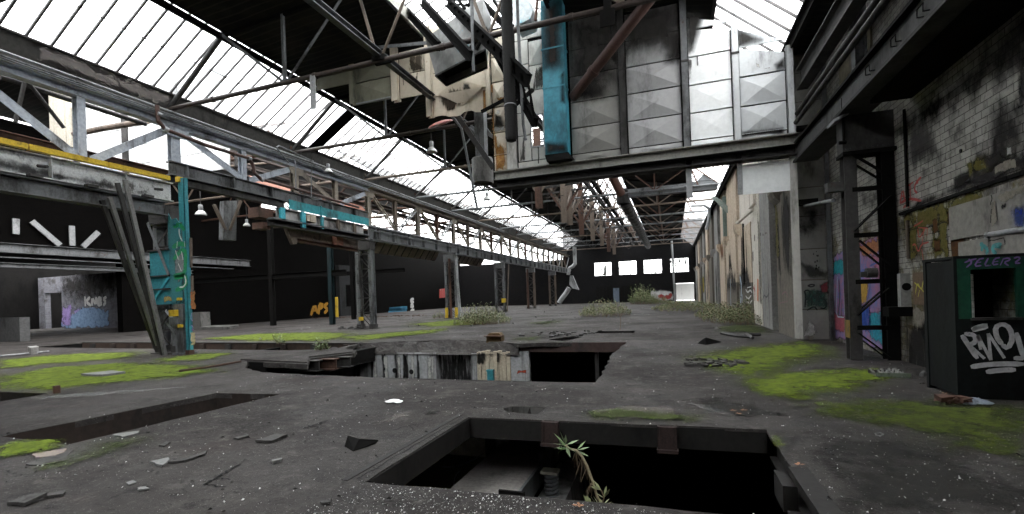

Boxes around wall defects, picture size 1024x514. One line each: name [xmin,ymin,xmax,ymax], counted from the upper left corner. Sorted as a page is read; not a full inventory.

corrosion [483,85,506,171]